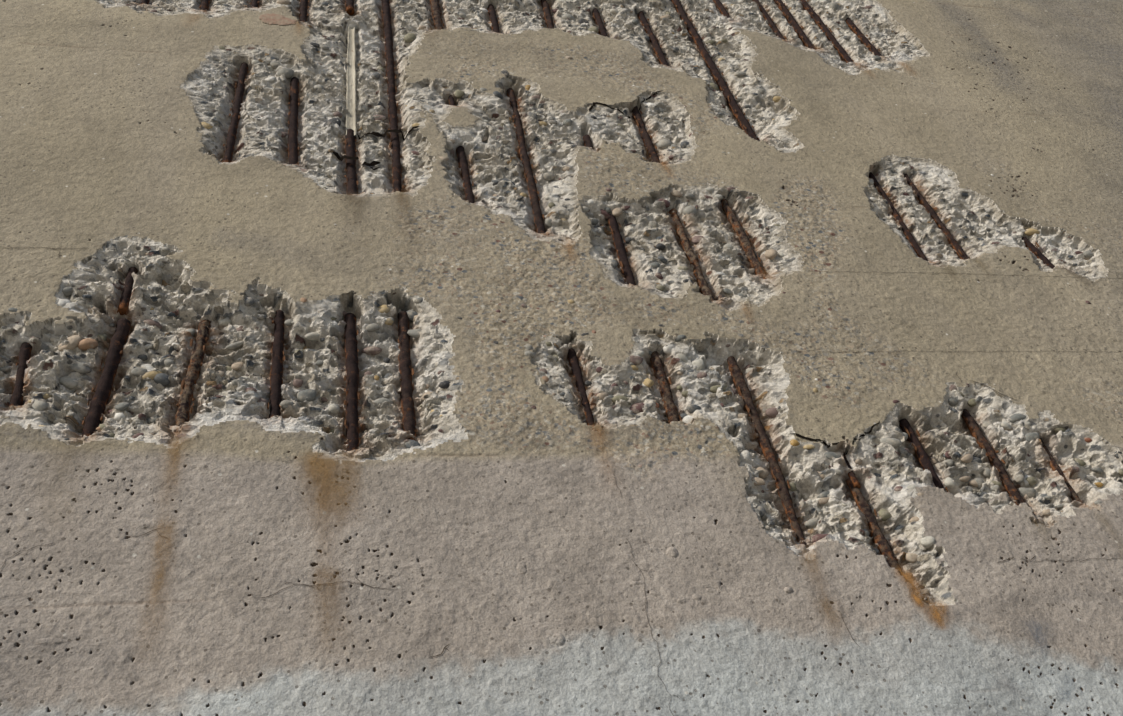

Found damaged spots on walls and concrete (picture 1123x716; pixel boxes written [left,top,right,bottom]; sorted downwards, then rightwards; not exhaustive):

spalling [864,154,1109,282]
spalling [0,233,469,488]
spalling [73,460,134,539]
spalling [524,324,1123,606]
crack [790,421,880,455]
spalling [0,530,81,664]